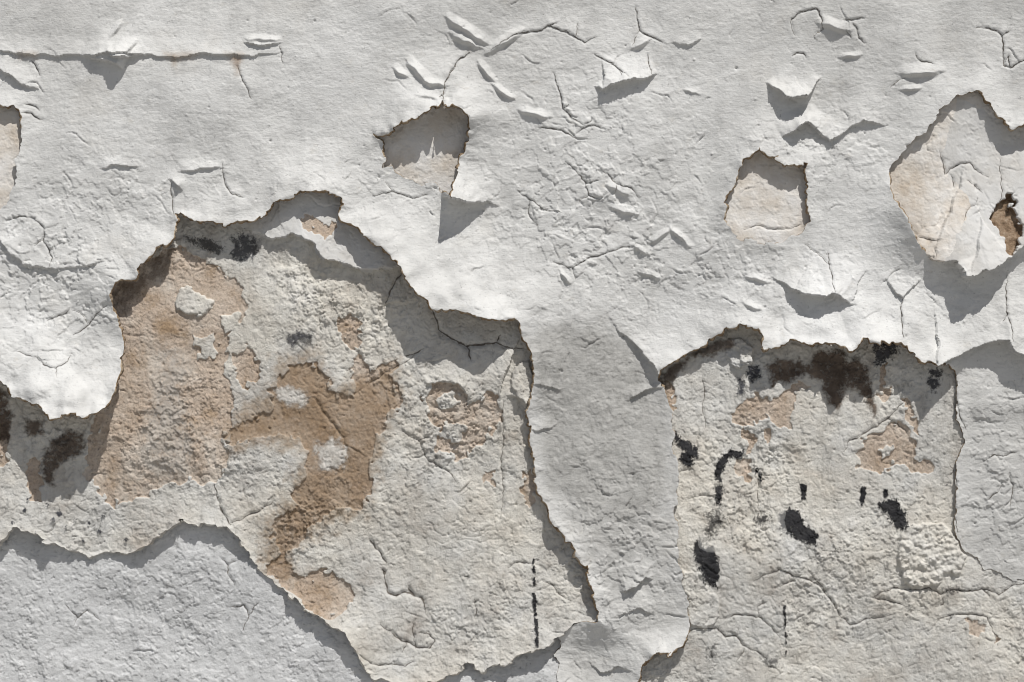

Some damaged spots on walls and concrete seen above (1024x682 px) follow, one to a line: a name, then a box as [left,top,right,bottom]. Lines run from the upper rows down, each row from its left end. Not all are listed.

peeling [369,64,478,194]
crack [519,165,639,225]
peeling [719,136,815,245]
peeling [883,83,1024,271]
mould [185,228,259,263]
leakage [660,340,734,388]
leakage [736,342,901,416]
mould [926,368,943,393]
leakage [25,420,85,485]
peeling [0,164,603,682]
peeling [635,294,1024,682]
crack [949,463,958,532]